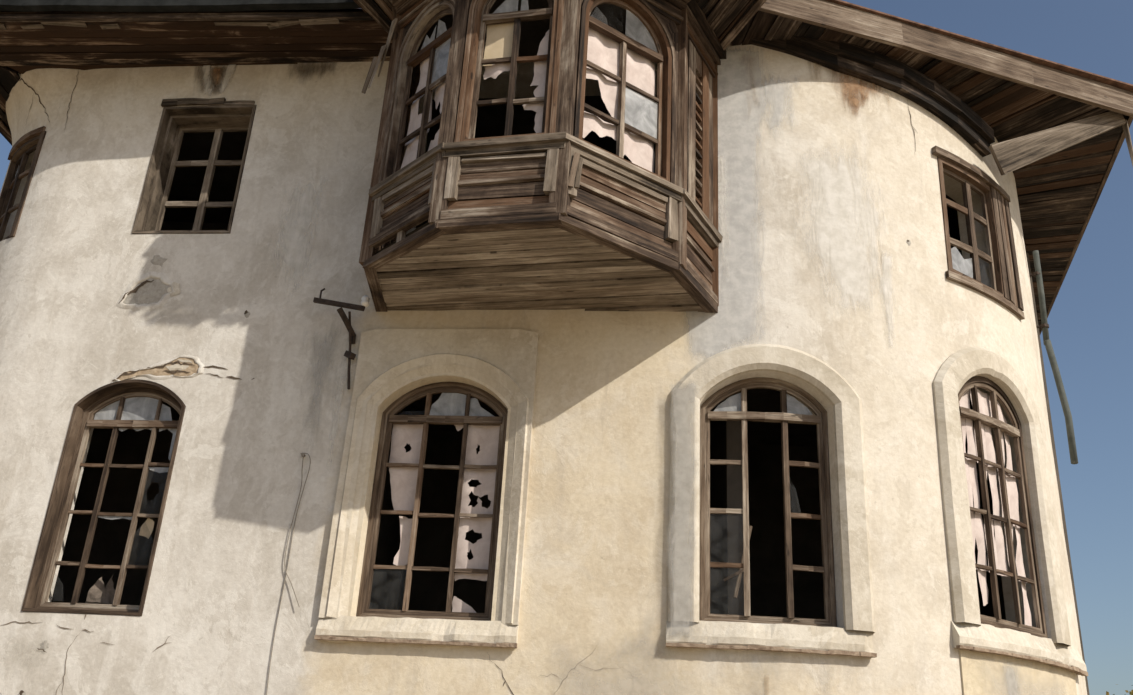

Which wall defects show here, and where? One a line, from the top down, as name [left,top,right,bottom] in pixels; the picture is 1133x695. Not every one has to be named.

crack [18,72,79,127]
spalling [116,255,180,311]
spalling [112,355,205,382]
crack [0,614,115,693]
crack [540,649,651,695]